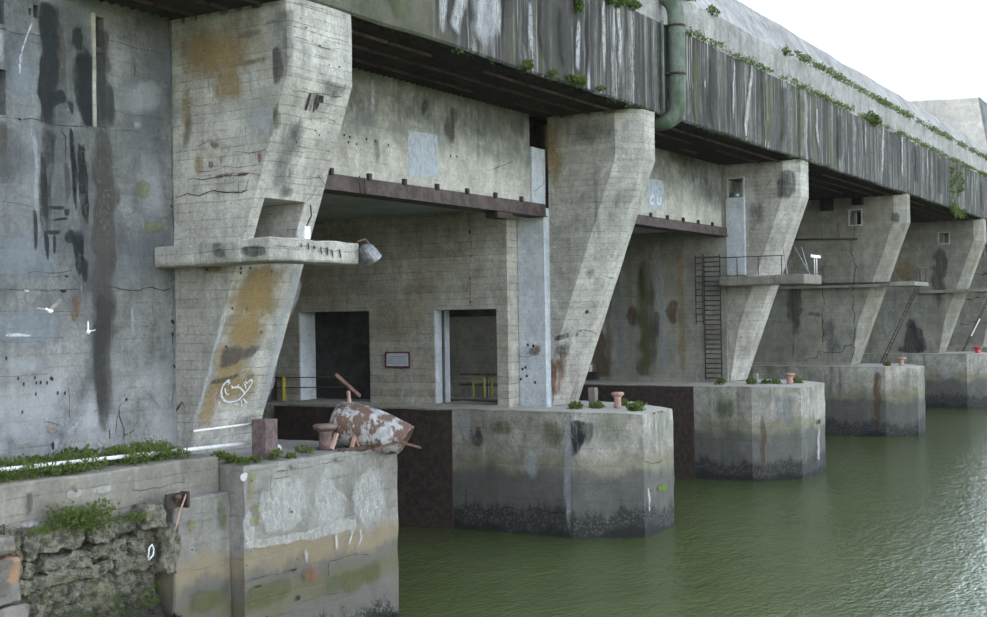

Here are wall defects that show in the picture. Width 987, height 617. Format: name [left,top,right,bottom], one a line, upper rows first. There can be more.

water stain [440,0,514,41]
water stain [529,0,606,75]
crack [18,118,84,156]
water stain [19,3,119,429]
water stain [788,285,820,330]
crack [752,224,857,361]
water stain [899,319,925,353]
water stain [547,420,593,513]